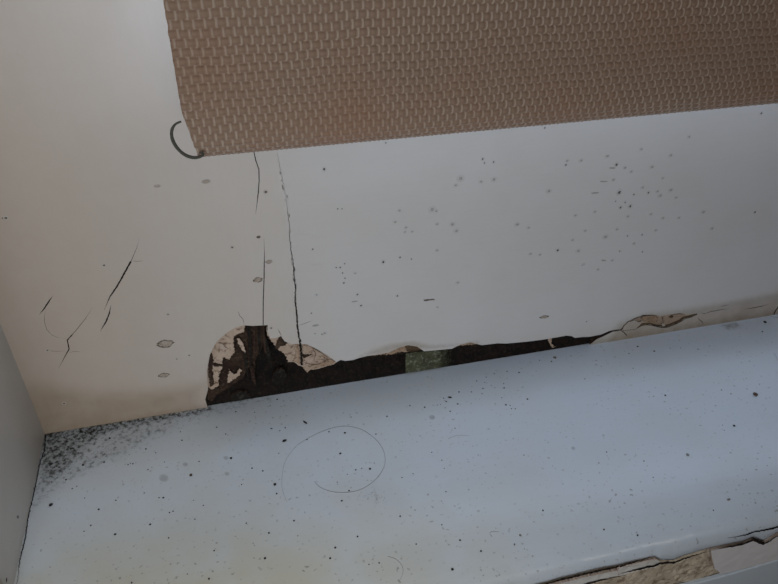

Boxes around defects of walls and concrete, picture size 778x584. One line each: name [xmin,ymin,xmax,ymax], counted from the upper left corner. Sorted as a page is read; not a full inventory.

crack [39,245,138,365]
crack [263,153,327,365]
spalling [206,313,692,406]
leakage [42,405,211,477]
spalling [539,533,778,584]